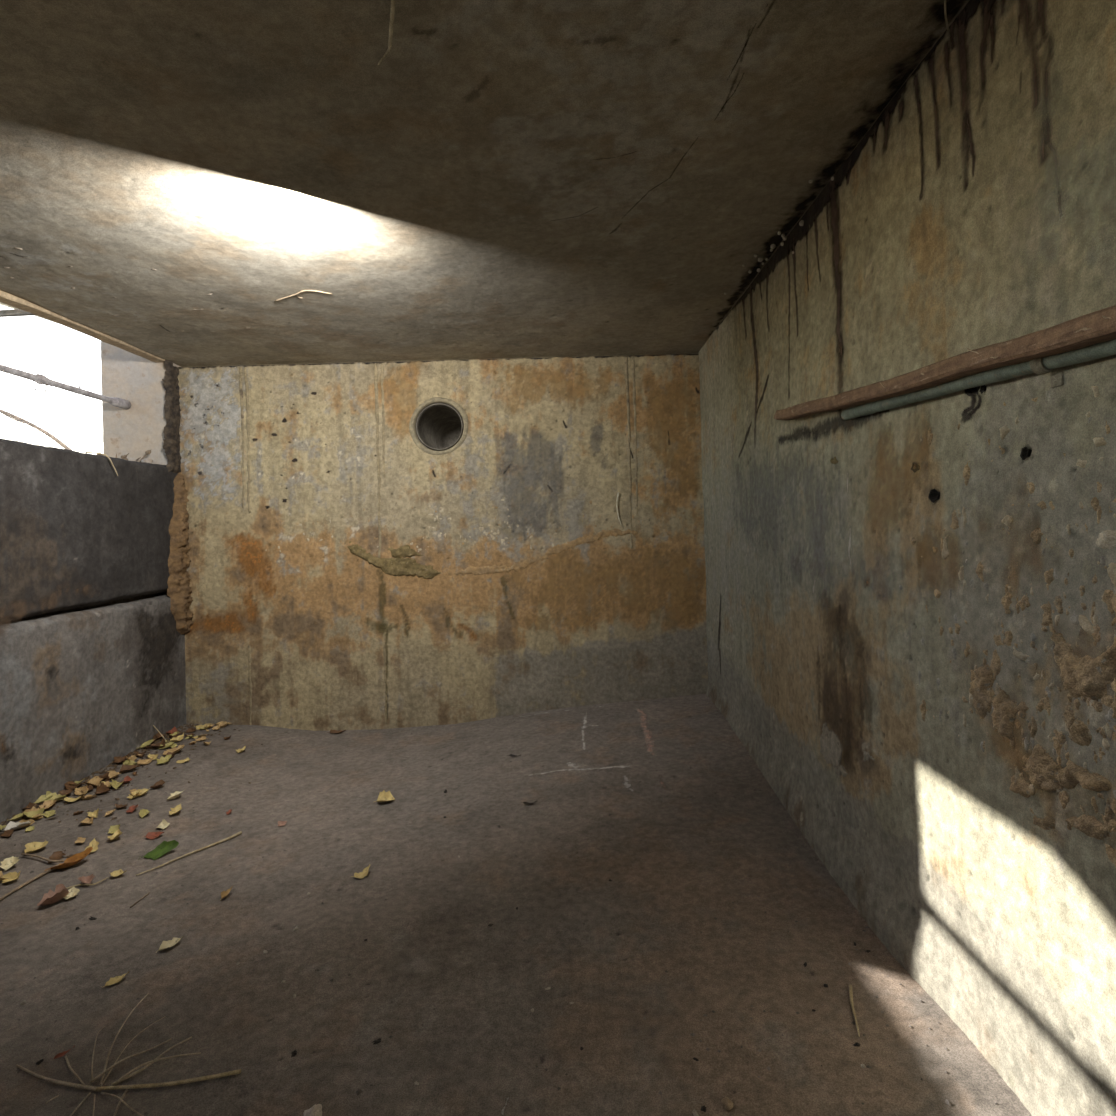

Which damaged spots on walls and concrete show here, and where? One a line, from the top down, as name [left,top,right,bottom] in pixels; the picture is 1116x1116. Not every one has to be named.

crack [715,0,775,119]
leakage [1016,0,1062,216]
leakage [709,0,1005,443]
rust [190,533,275,632]
spalling [265,499,643,581]
leakage [502,432,563,530]
peeling [910,481,1116,794]